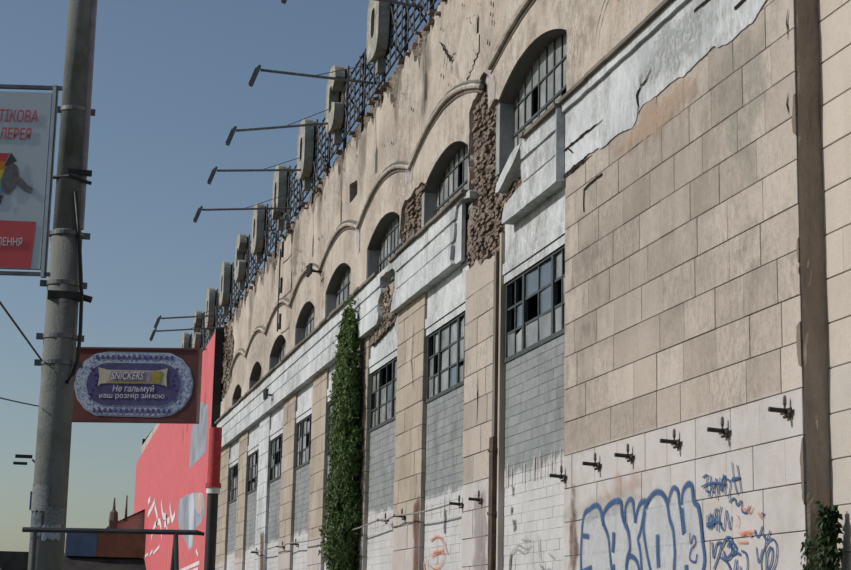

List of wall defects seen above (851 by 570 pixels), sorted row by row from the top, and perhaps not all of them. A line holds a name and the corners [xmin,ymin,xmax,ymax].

crack [439,41,476,73]
crack [636,69,651,112]
flaking render [402,183,427,245]
flaking render [460,75,524,272]
crack [564,119,603,177]
crack [583,173,602,212]
flaking render [369,281,396,347]
rust [569,487,578,570]